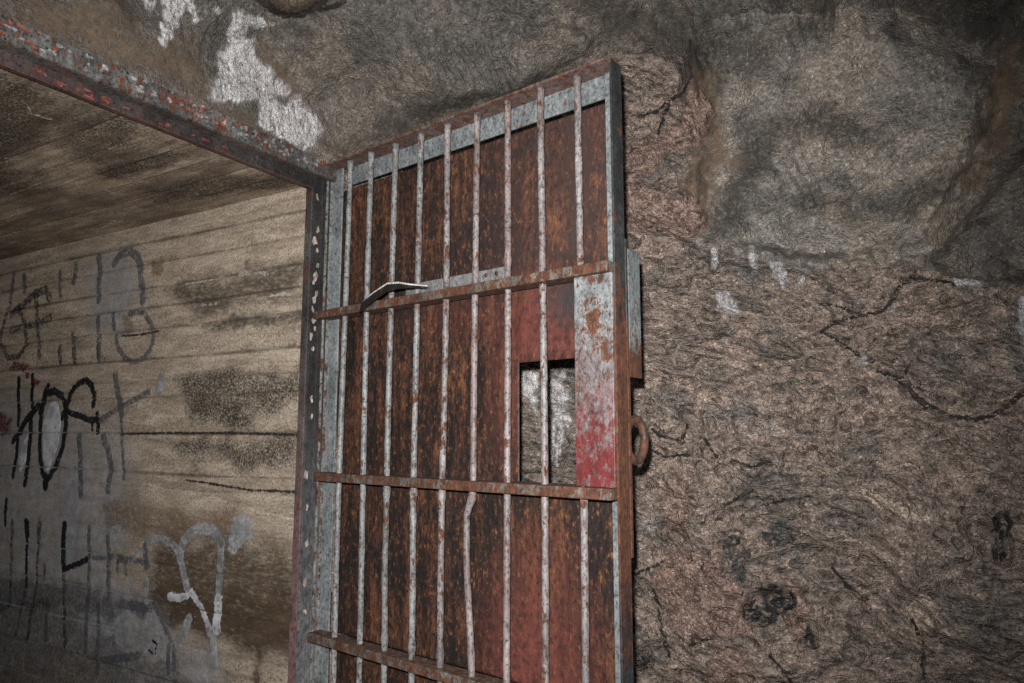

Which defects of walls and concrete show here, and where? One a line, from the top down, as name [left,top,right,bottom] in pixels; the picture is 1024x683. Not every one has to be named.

damp [176,367,299,469]
crack [818,276,1024,422]